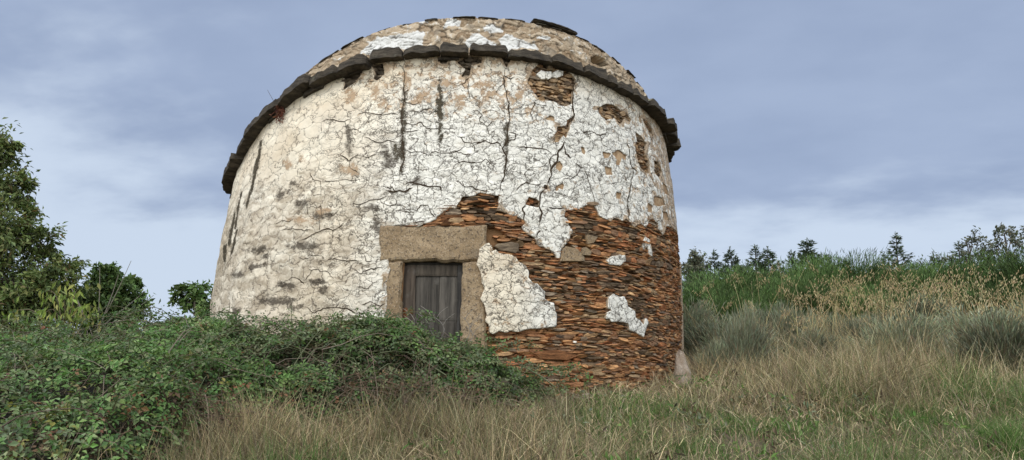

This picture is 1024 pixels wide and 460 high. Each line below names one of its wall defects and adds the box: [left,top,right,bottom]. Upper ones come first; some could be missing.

crack [276,65,640,313]
spalling [403,104,684,396]
spalling [527,64,575,142]